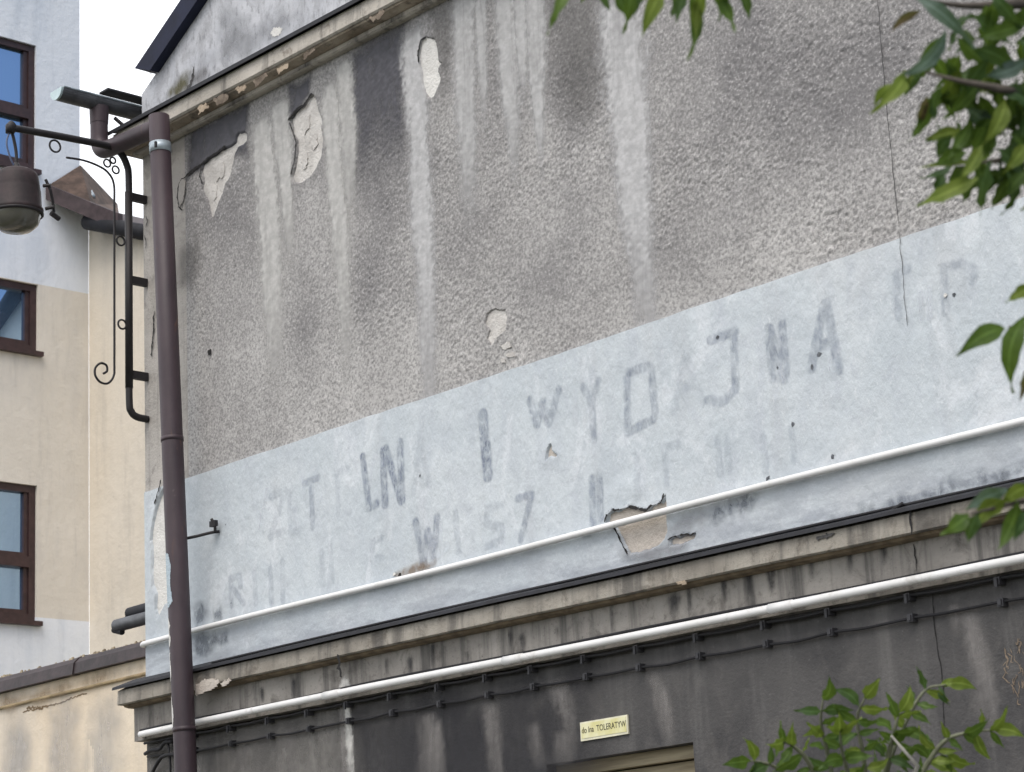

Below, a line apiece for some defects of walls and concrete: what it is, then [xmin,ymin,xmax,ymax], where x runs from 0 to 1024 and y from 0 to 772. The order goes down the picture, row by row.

flaking render [186,133,247,217]
leakage [250,100,294,355]
flaking render [288,93,323,183]
leakage [321,61,356,339]
leakage [400,29,436,375]
flaking render [417,36,441,98]
leakage [452,0,547,186]
leakage [599,1,655,314]
crack [877,3,908,326]
crack [909,510,917,571]
spalling [194,678,232,696]
crack [932,595,944,725]